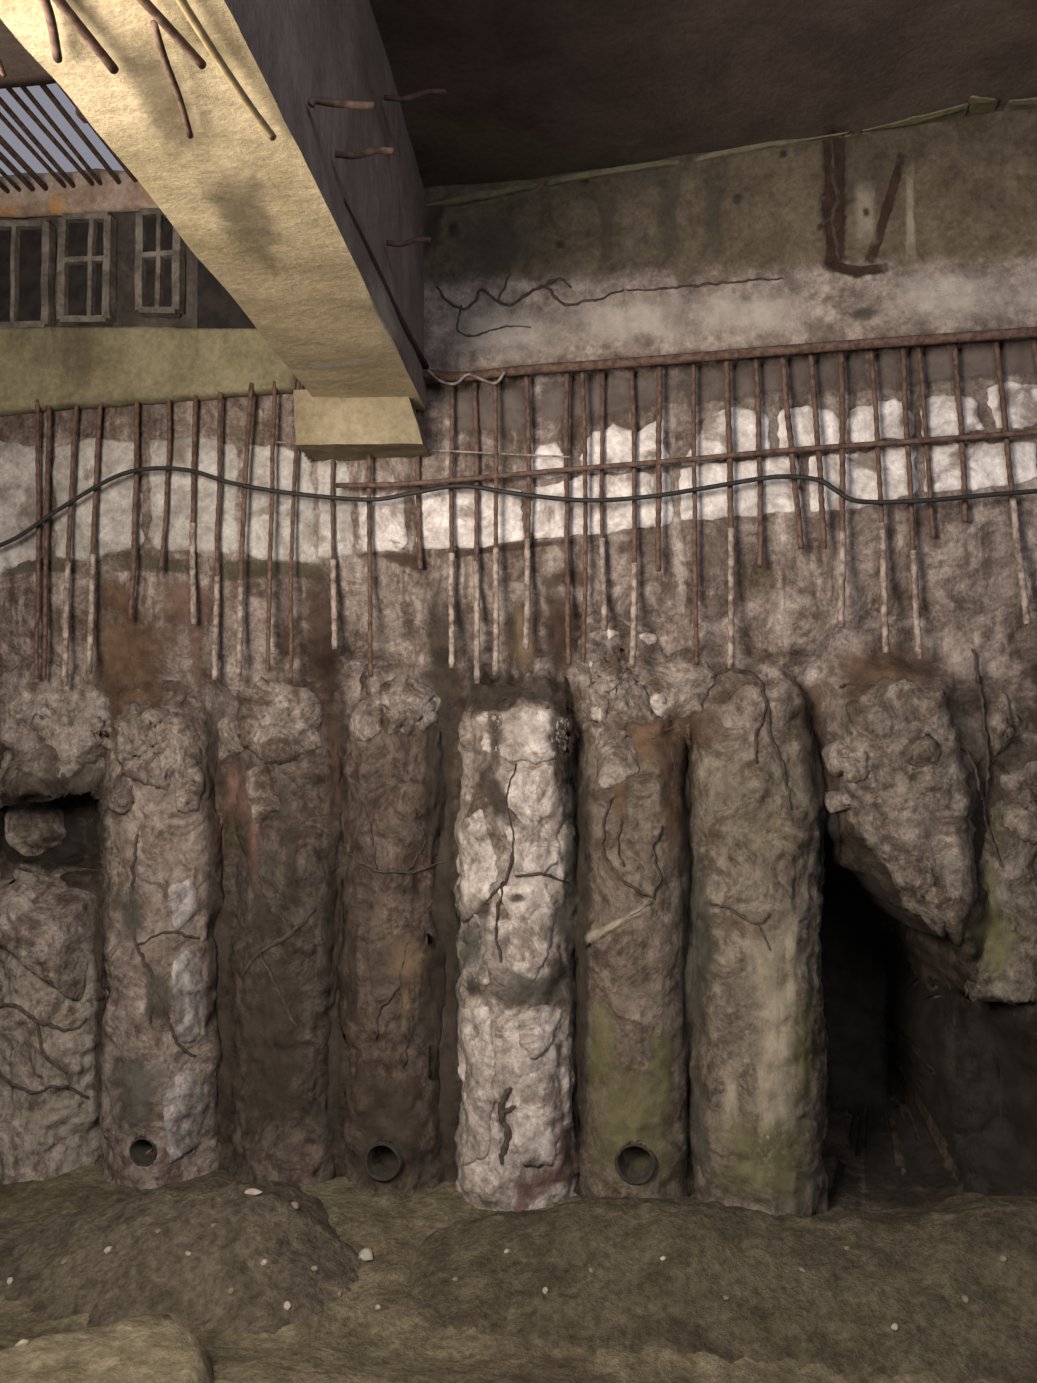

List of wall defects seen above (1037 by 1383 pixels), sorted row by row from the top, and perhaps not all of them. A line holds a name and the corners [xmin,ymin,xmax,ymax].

rust [821,130,903,278]
damp [442,341,1036,435]
peeling [0,337,1037,1168]
crack [710,668,791,809]
crack [484,764,570,963]
crack [0,1003,90,1098]
crack [498,1086,516,1165]